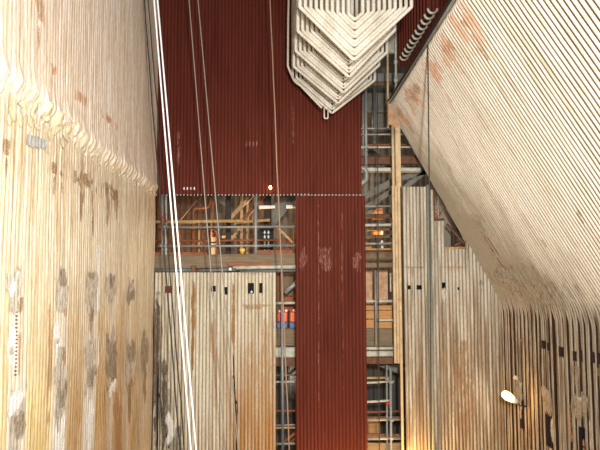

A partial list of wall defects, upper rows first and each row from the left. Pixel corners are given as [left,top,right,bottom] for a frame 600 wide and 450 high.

corrosion [449,3,490,61]
corrosion [395,34,464,135]
damp [158,361,175,450]
corrosion [239,318,275,450]